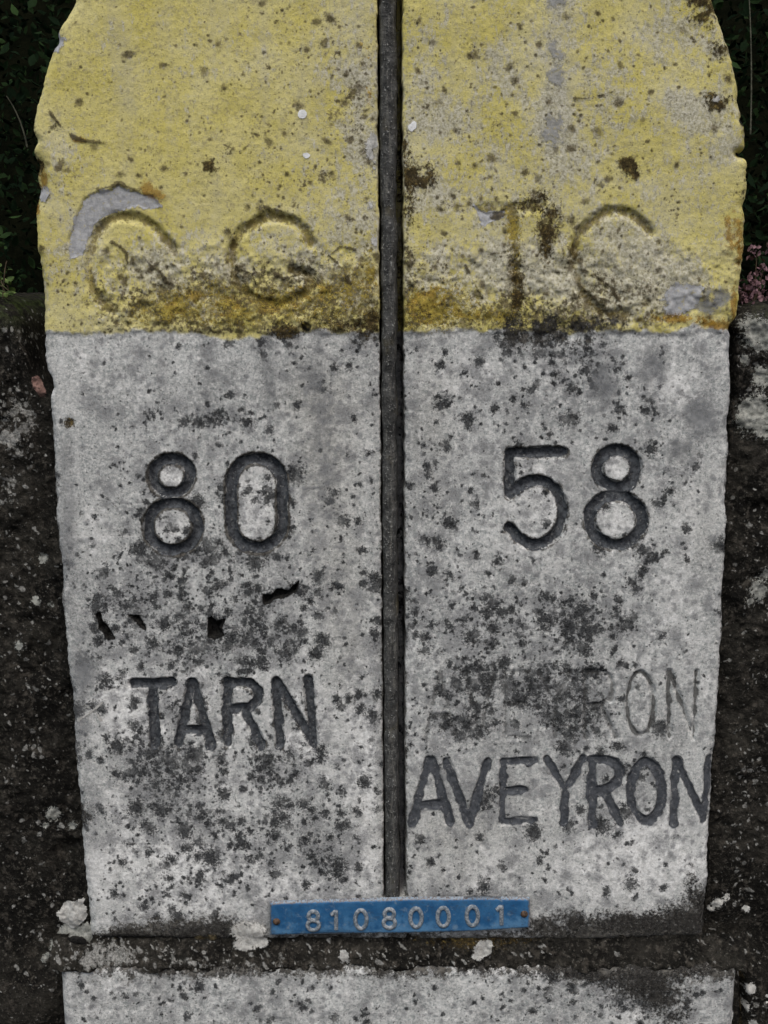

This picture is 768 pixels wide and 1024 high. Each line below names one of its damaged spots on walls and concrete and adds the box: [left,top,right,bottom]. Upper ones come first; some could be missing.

peeling [69,181,166,259]
peeling [660,281,730,318]
leakage [506,859,706,939]